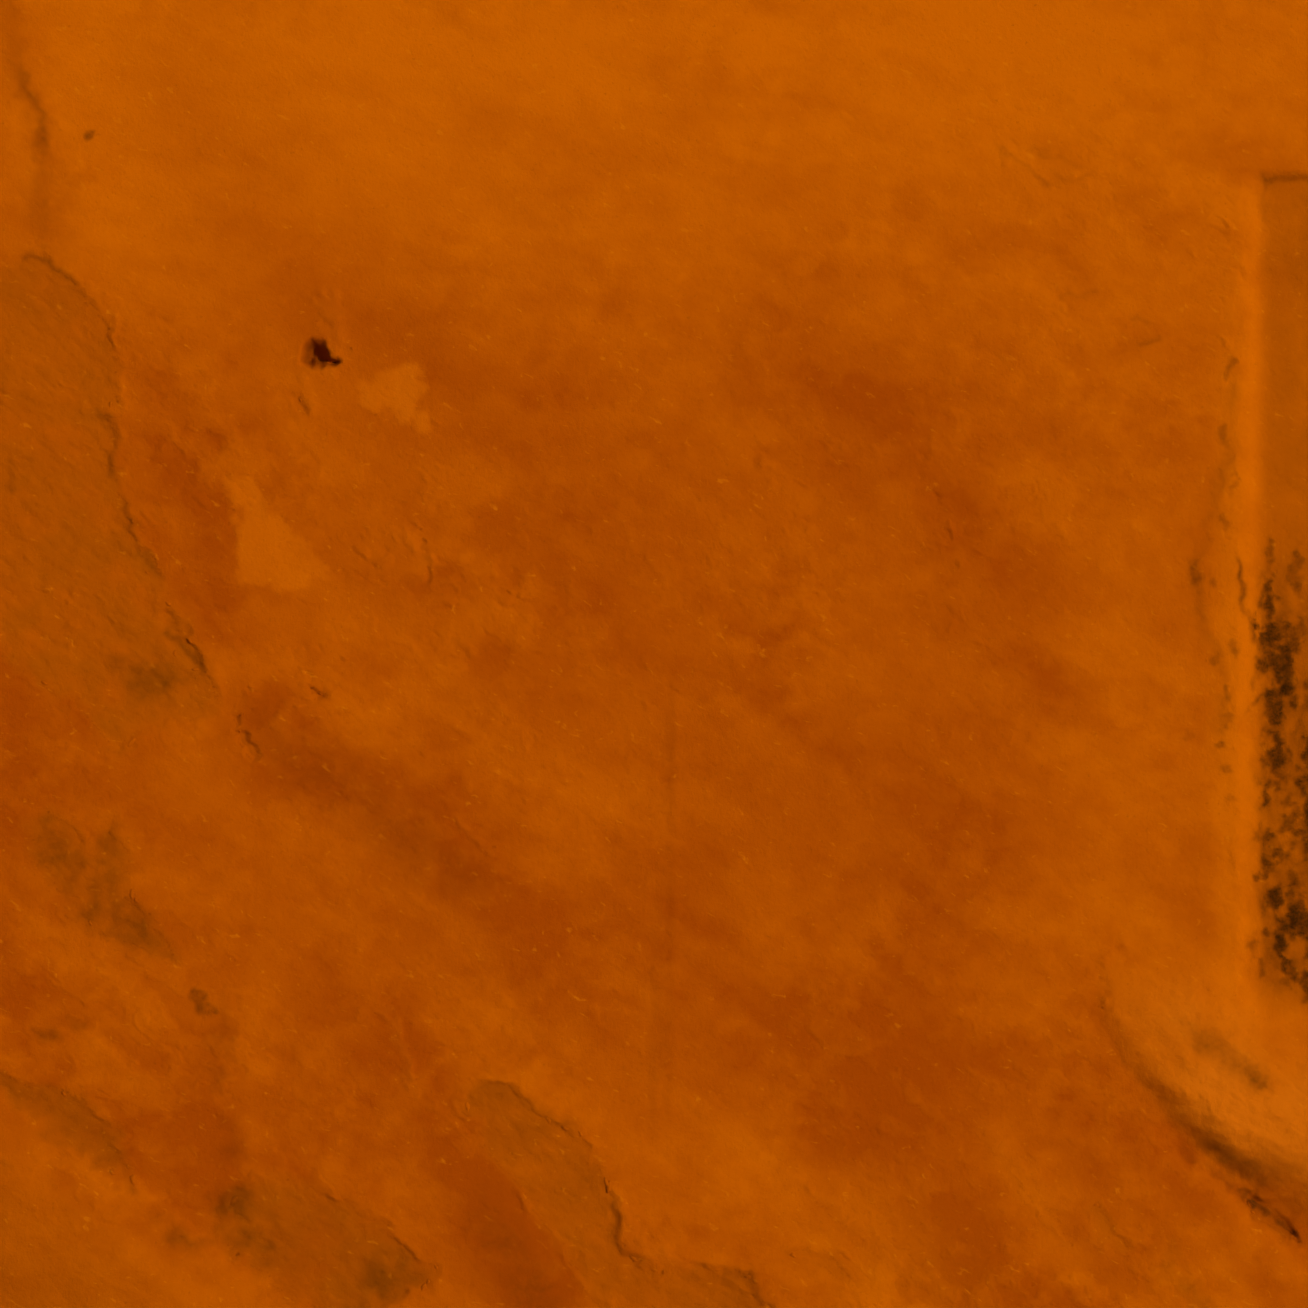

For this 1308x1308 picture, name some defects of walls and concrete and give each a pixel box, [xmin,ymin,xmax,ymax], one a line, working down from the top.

spalling [304,343,338,364]
leakage [1255,583,1308,972]